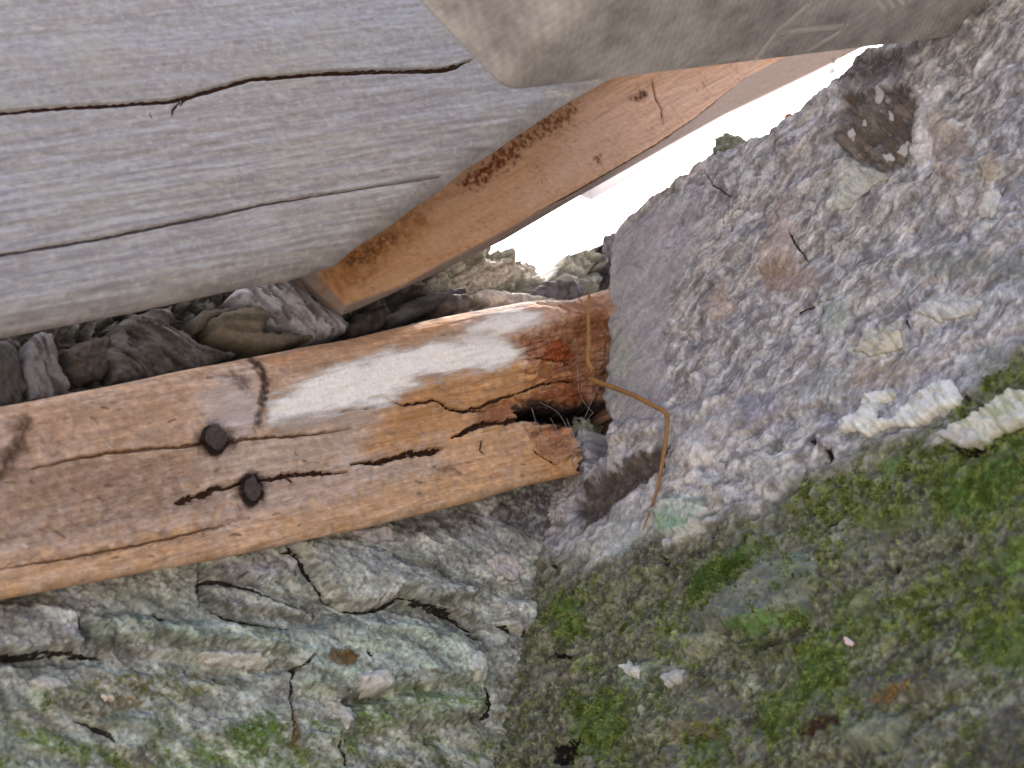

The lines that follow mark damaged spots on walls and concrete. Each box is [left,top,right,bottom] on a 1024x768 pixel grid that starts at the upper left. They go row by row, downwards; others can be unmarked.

crack [0,62,469,118]
corrosion [457,103,577,190]
spalling [831,84,916,212]
crack [0,177,439,257]
crack [32,443,196,470]
corrosion [195,423,234,454]
corrosion [239,471,265,508]
crack [174,358,572,506]
crack [196,548,525,641]
crack [0,618,100,663]